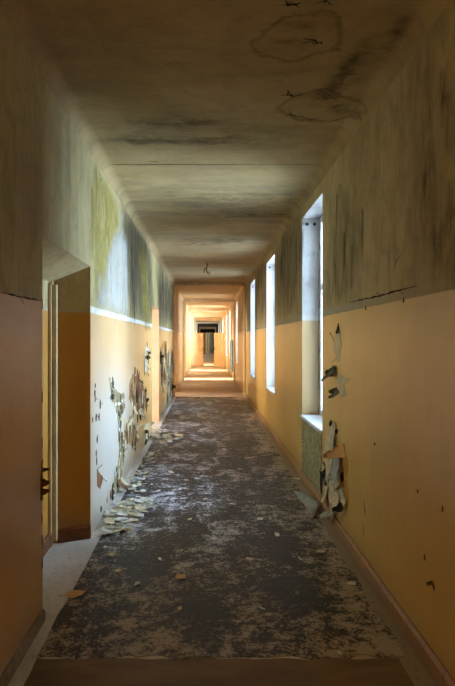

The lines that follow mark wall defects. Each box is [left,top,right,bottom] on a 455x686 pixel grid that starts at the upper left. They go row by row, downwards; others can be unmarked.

leakage [92,177,171,320]
crack [349,286,415,303]
peeling [321,323,350,398]
peeling [96,342,176,513]
peeling [301,419,349,522]